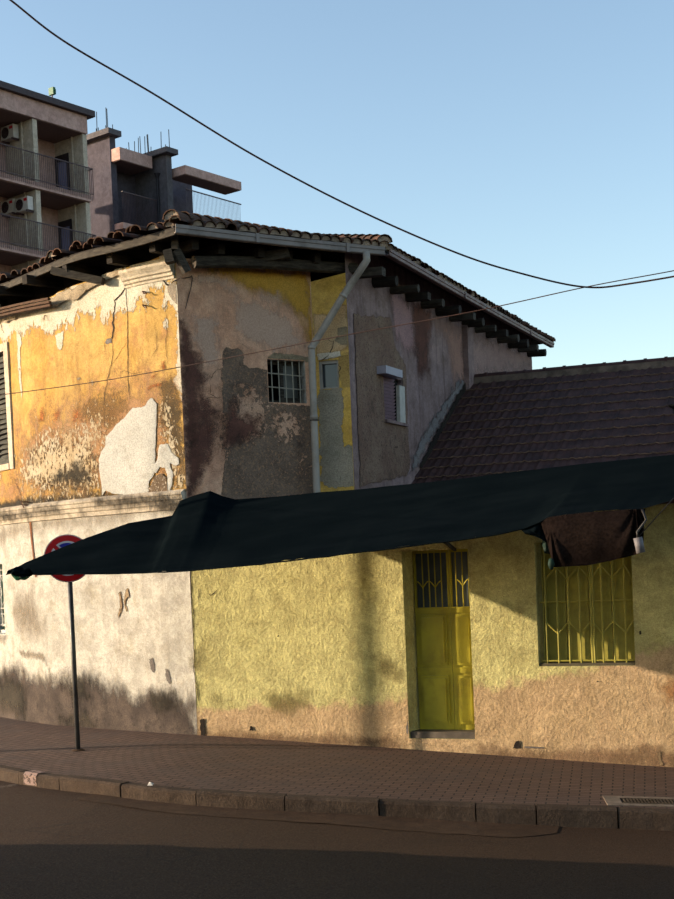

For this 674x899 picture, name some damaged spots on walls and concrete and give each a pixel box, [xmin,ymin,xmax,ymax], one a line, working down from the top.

peeling [0,255,182,402]
damp [0,321,221,508]
crack [104,287,140,427]
damp [0,667,399,748]